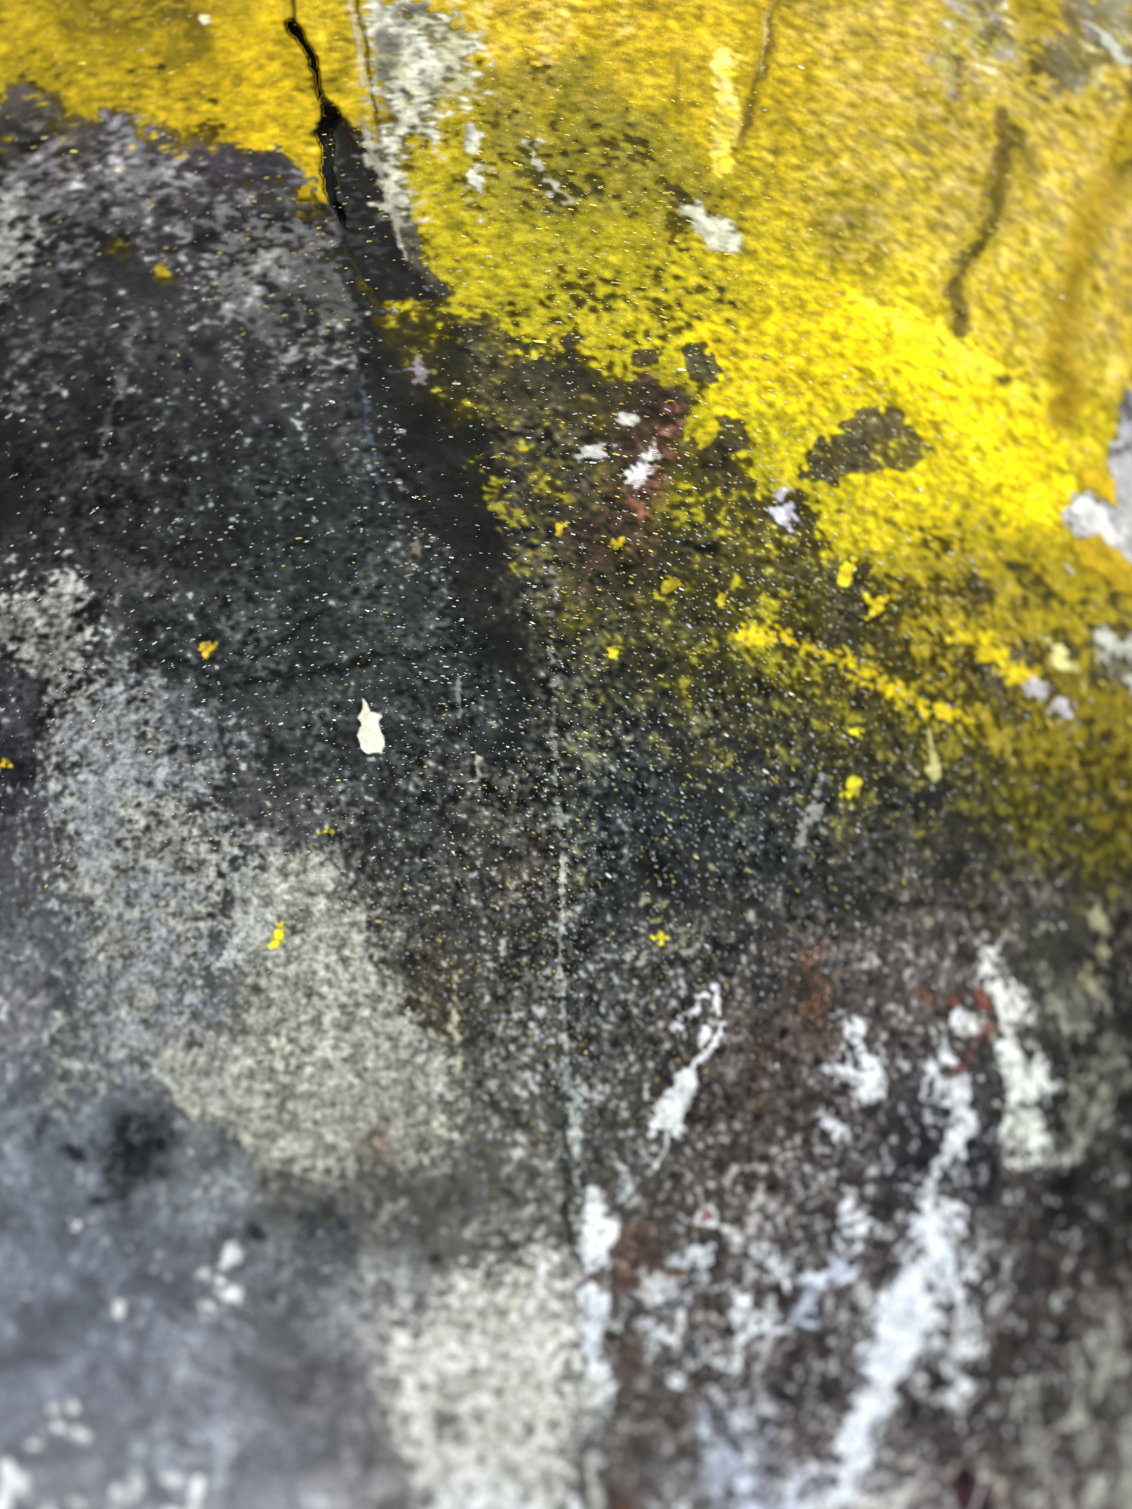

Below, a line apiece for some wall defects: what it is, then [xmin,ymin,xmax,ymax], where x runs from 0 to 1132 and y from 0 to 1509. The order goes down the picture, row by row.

crack [284,0,360,224]
spalling [0,166,78,331]
water stain [624,442,661,489]
water stain [25,665,464,1264]
water stain [648,1022,725,1169]
water stain [690,905,1132,1509]
peeling [0,1460,29,1509]
peeling [49,1389,90,1441]
peeling [111,1473,204,1509]